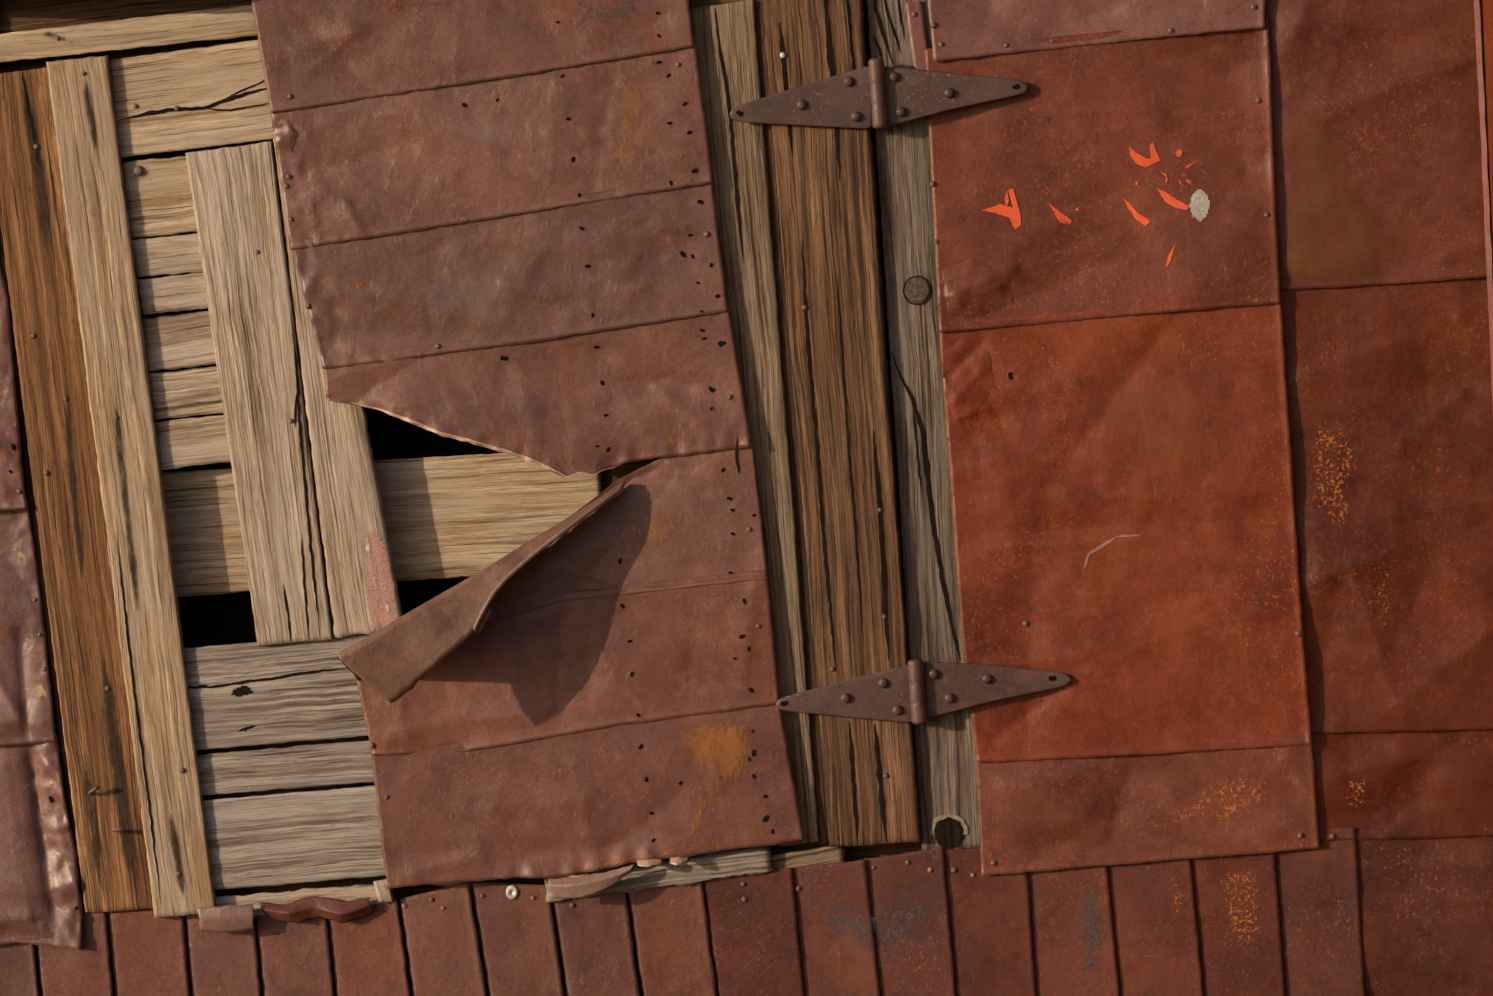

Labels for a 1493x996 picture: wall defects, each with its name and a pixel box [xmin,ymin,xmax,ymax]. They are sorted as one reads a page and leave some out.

crack [118,80,267,121]
peeling [336,481,626,703]
crack [801,243,889,672]
crack [891,352,961,661]